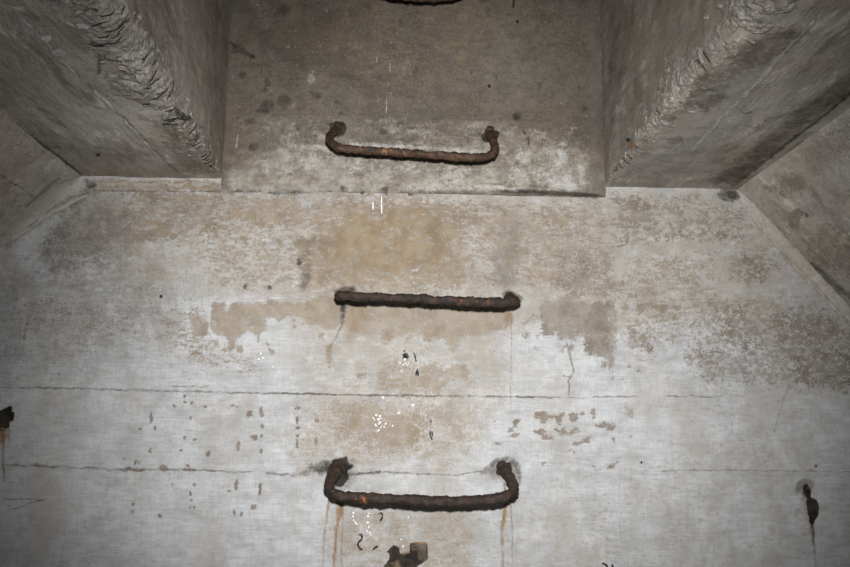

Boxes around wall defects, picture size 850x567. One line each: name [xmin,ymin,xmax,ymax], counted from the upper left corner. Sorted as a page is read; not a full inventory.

spalling [39,0,219,173]
spalling [608,0,798,181]